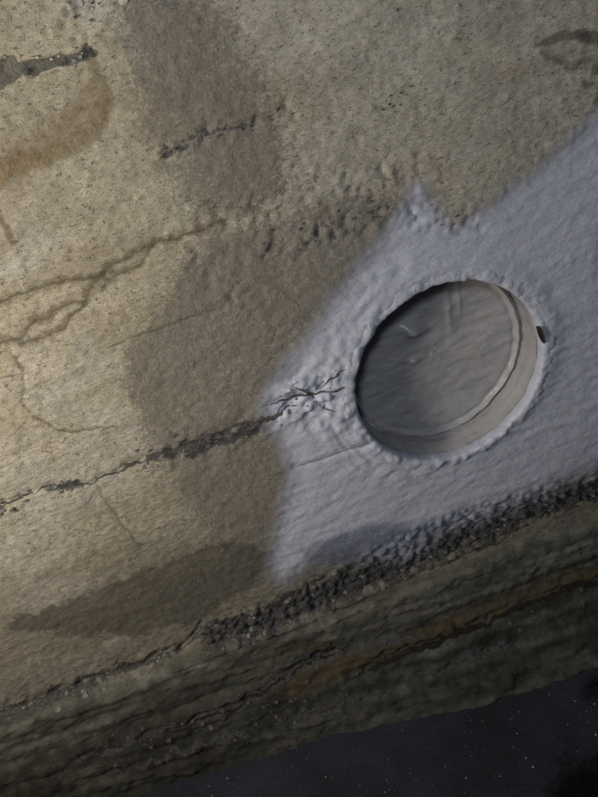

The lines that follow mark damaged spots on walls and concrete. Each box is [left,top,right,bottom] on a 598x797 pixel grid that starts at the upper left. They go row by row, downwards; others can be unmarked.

damp [112,0,288,217]
crack [0,222,218,344]
crack [0,369,346,516]
damp [119,195,404,569]